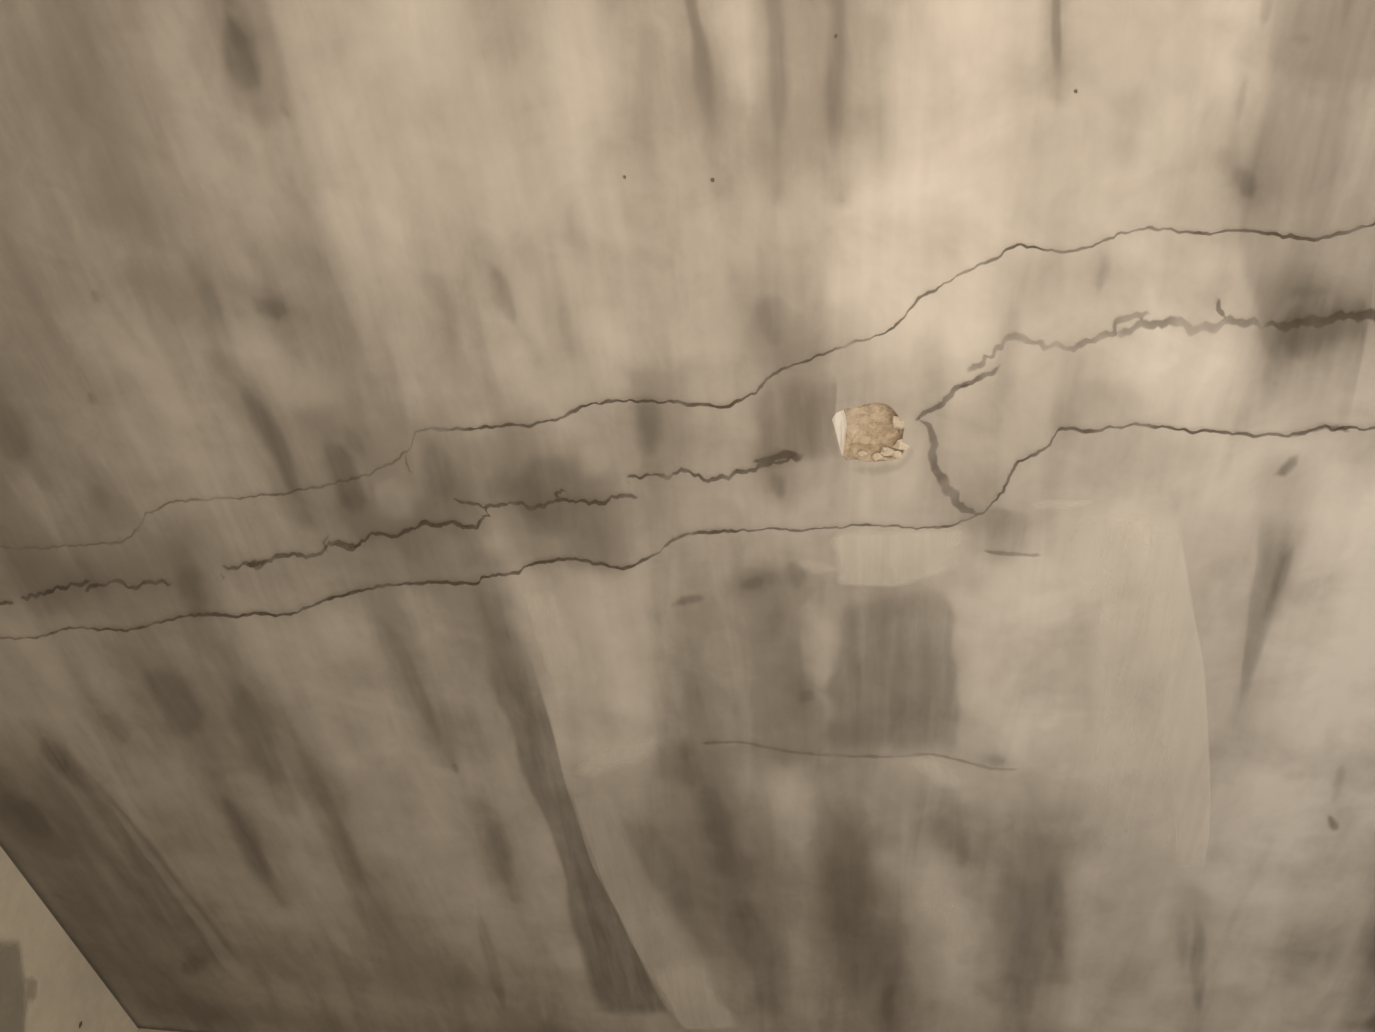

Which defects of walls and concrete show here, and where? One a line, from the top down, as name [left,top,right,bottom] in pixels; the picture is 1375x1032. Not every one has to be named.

crack [990,243,1047,262]
crack [1178,222,1375,242]
crack [874,285,942,337]
crack [1291,310,1375,328]
crack [464,350,833,431]
crack [927,376,980,412]
spalling [832,402,910,461]
crack [1150,425,1375,438]
crack [993,426,1110,502]
crack [348,451,798,551]
crack [0,580,144,605]
crack [28,524,956,639]